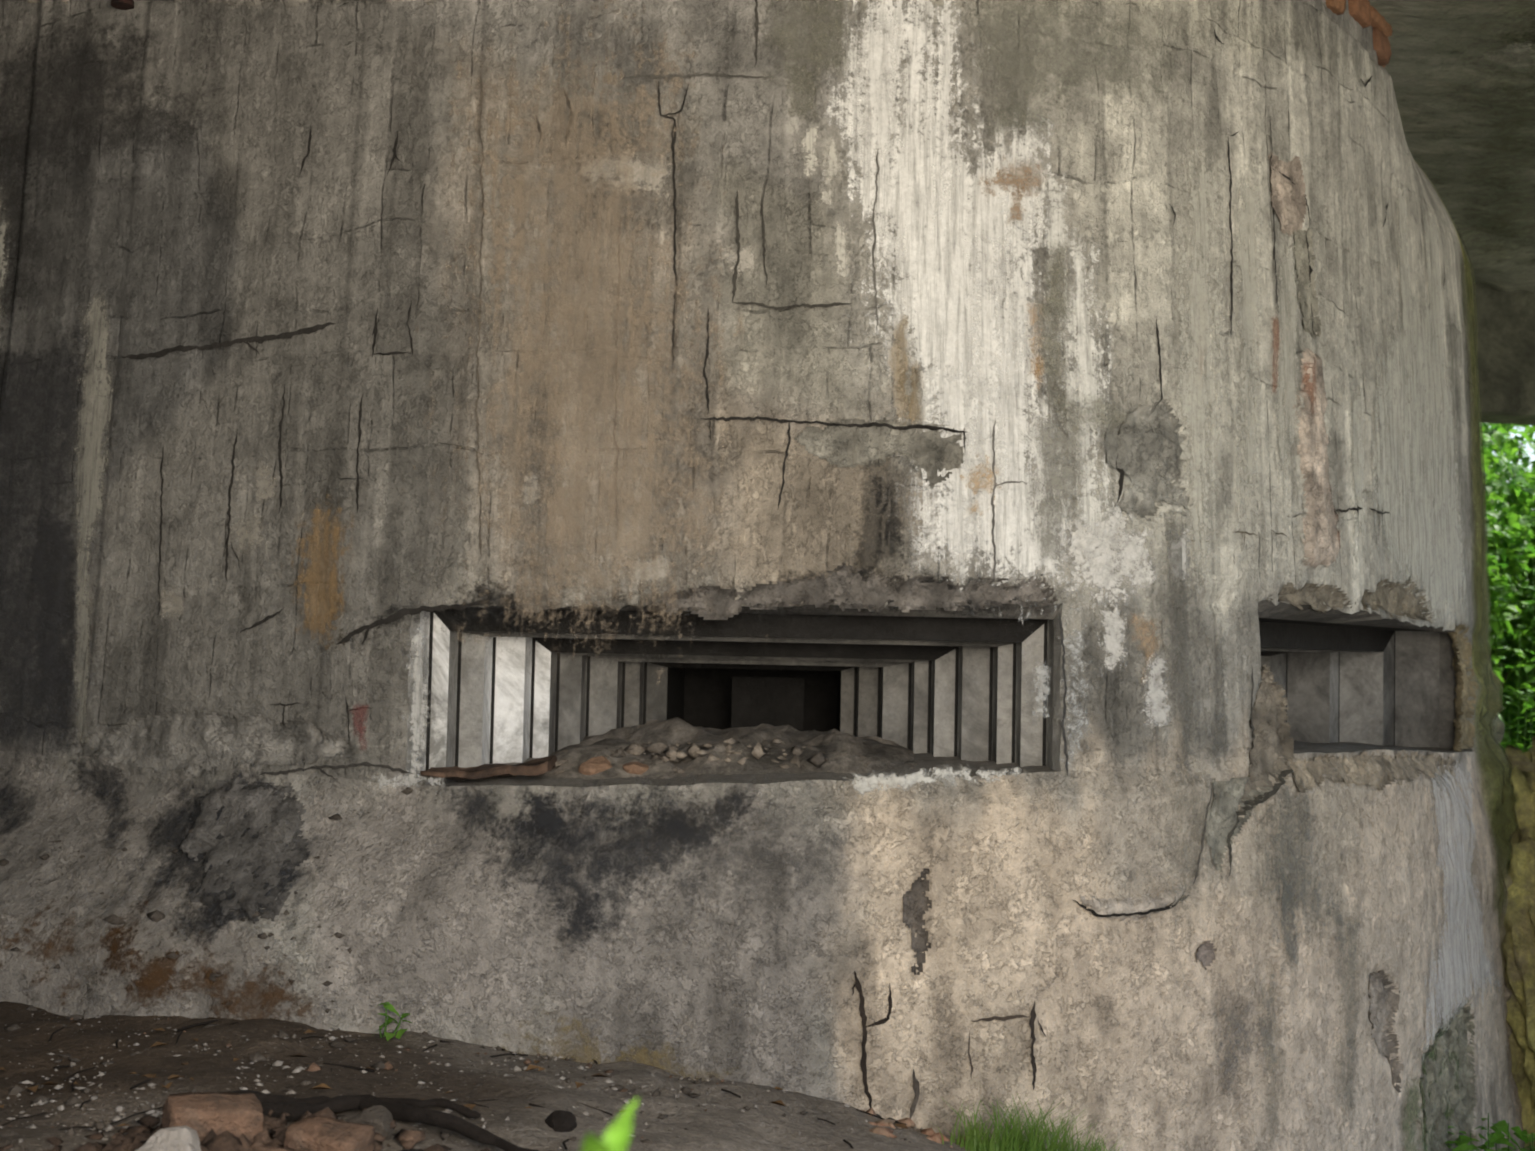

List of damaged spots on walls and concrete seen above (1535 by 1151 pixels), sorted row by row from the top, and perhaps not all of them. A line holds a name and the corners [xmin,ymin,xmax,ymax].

water stain [0,135,38,314]
crack [625,0,1026,585]
crack [1228,116,1316,338]
flaking render [1268,152,1321,340]
water stain [69,293,113,742]
water stain [766,0,1304,766]
spalling [1104,399,1198,521]
spalling [1268,577,1433,623]
spalling [903,868,932,975]
crack [1073,763,1293,917]
crack [852,971,892,1108]
crack [968,1001,1046,1090]